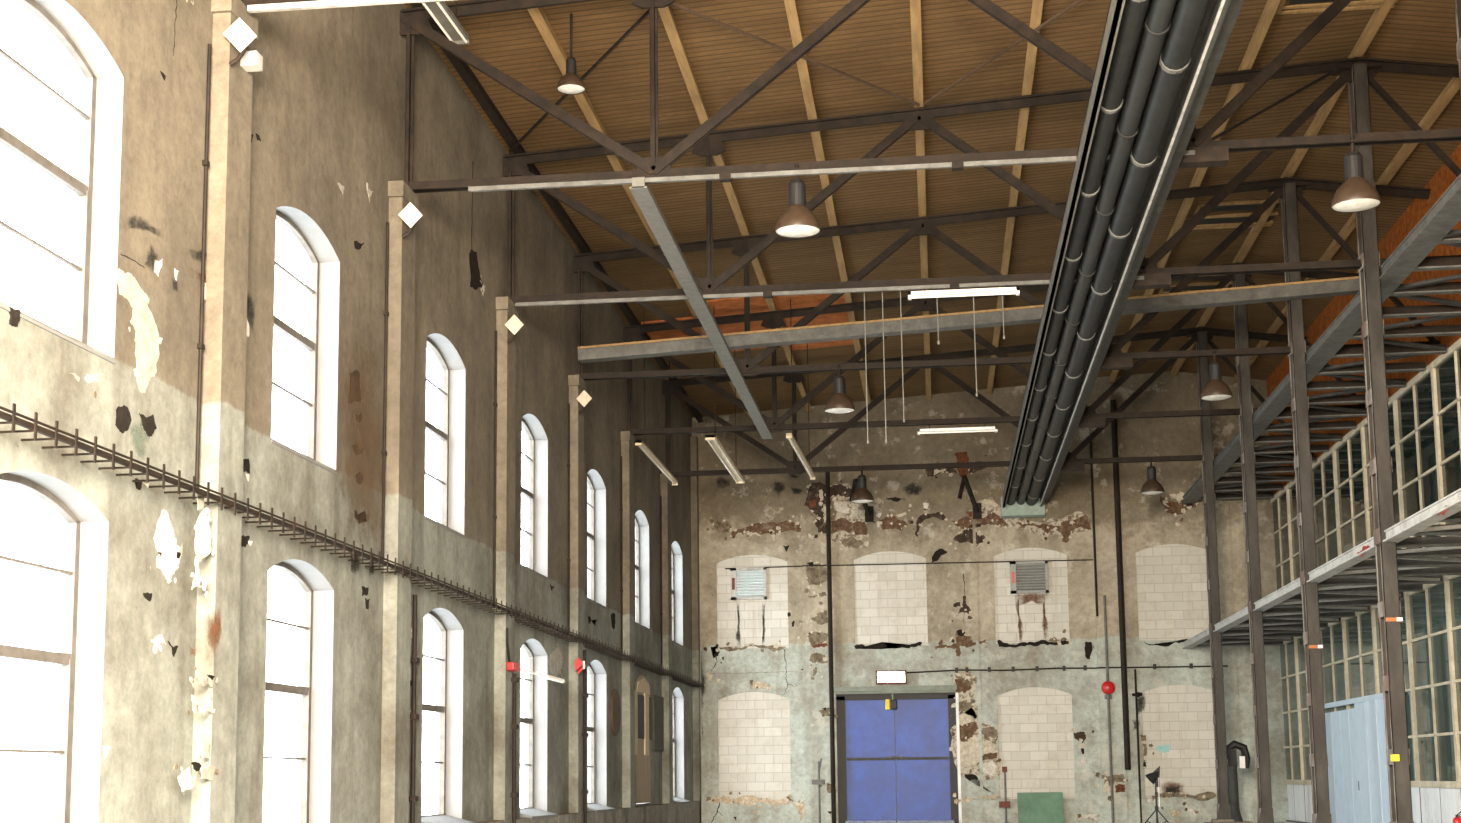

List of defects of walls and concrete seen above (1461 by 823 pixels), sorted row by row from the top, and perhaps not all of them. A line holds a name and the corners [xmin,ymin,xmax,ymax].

spalling [154,260,179,280]
peeling [116,268,163,393]
spalling [115,405,157,454]
peeling [150,489,214,599]
spalling [707,480,1091,563]
spalling [787,557,828,680]
spalling [151,634,178,657]
spalling [1084,642,1094,659]
peeling [188,667,219,716]
peeling [810,707,838,727]
peeling [931,620,1010,804]
peeling [173,743,219,796]